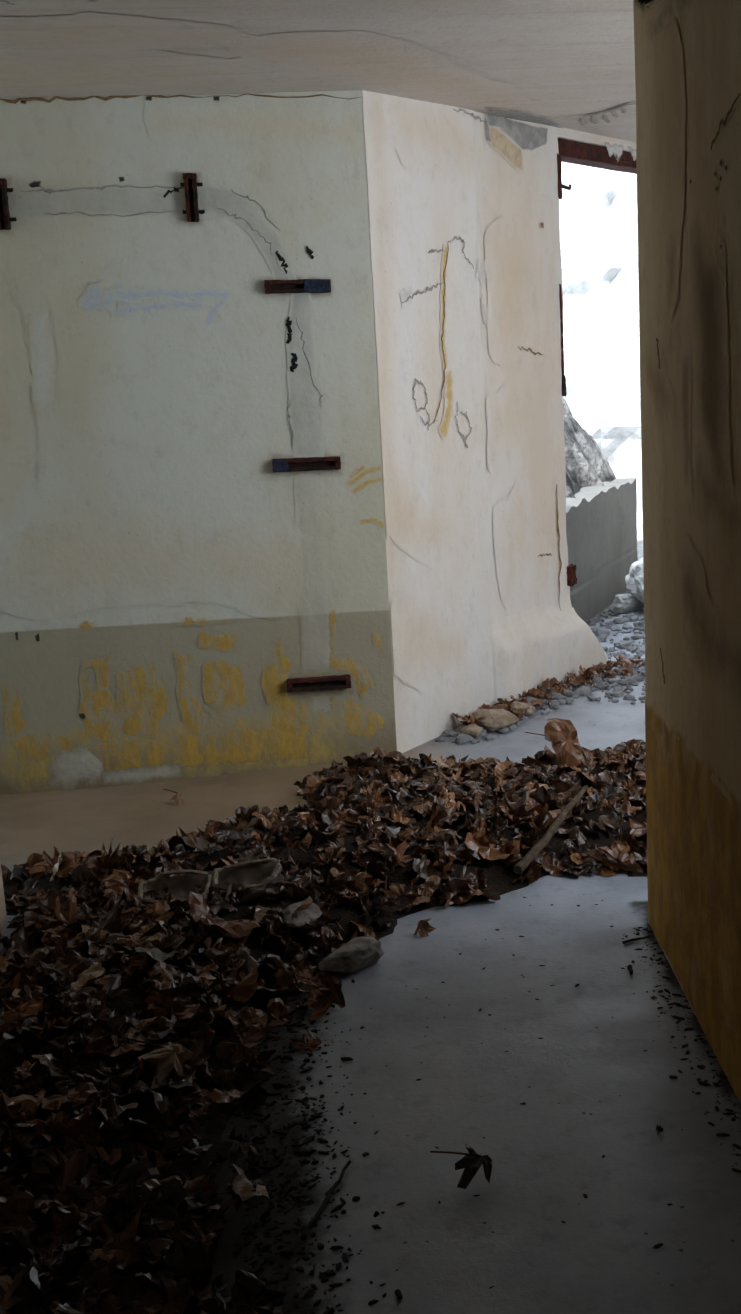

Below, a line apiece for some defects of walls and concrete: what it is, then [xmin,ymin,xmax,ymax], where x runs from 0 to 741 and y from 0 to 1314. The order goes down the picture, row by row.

corrosion [0,221,15,238]